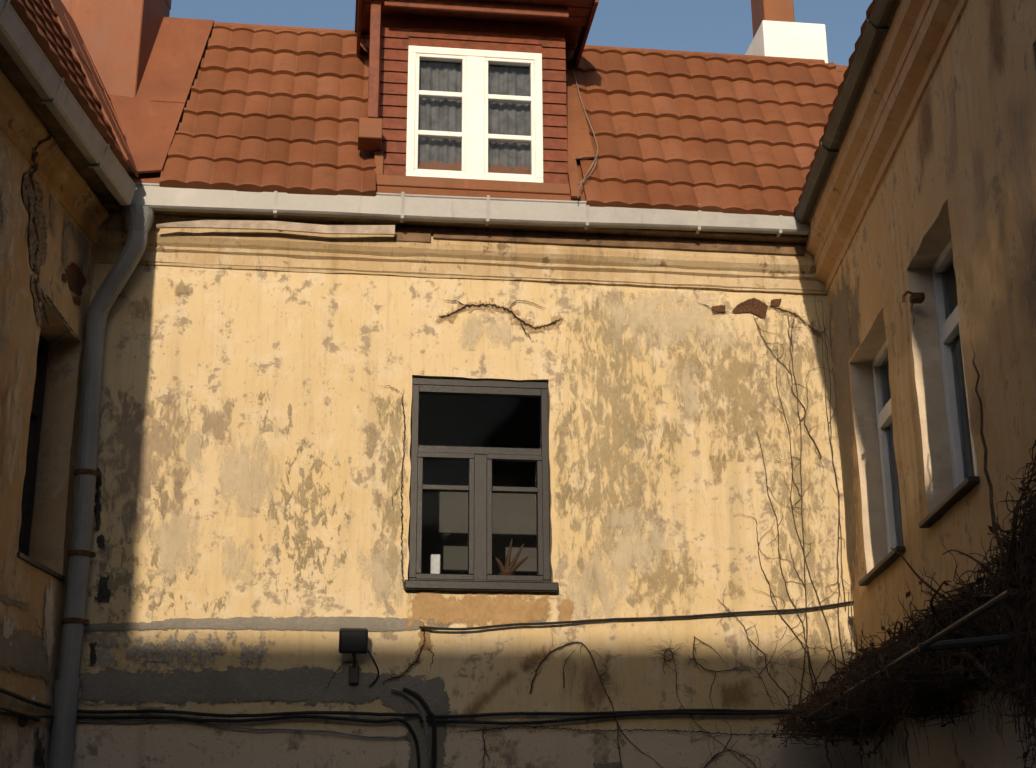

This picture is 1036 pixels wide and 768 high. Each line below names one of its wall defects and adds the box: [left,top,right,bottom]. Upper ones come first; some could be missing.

crack [0,131,80,341]
spalling [63,263,87,306]
crack [435,298,565,341]
peeling [84,388,275,675]
peeling [259,432,352,598]
peeling [363,391,408,601]
peeling [555,291,845,655]
crack [383,619,434,686]